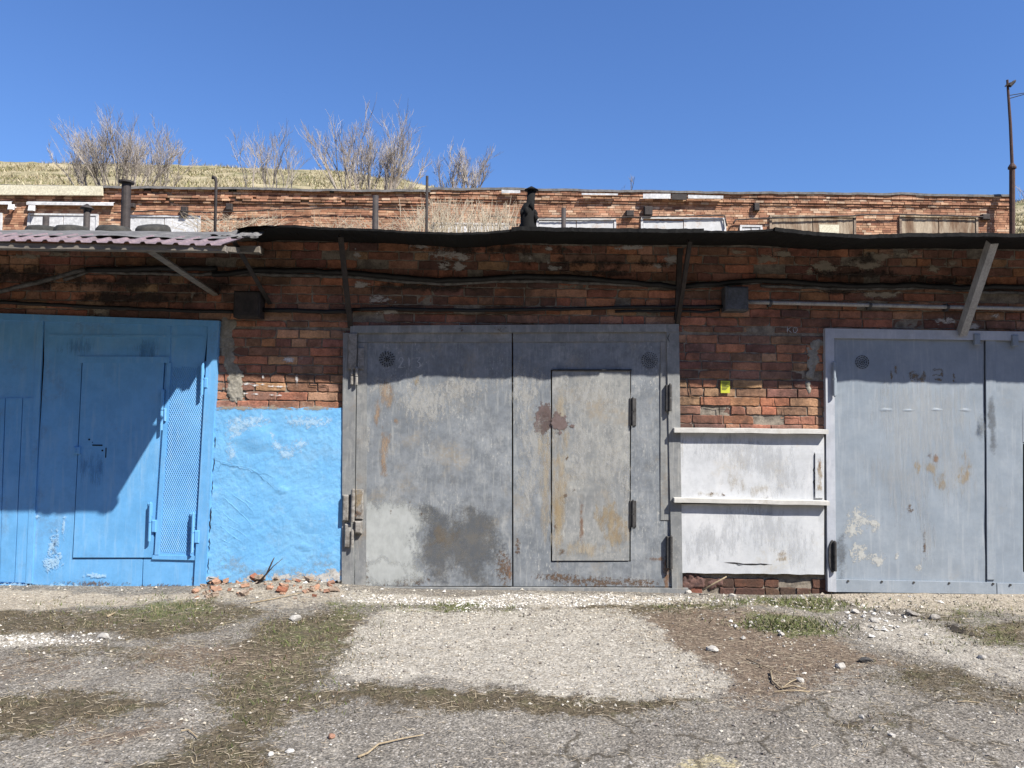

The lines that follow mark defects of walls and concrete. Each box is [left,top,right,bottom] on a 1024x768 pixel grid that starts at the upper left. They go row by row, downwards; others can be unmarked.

peeling [0,515,123,587]
crack [207,438,275,581]
damp [354,500,512,587]
rust [536,557,669,588]
peeling [845,504,899,567]